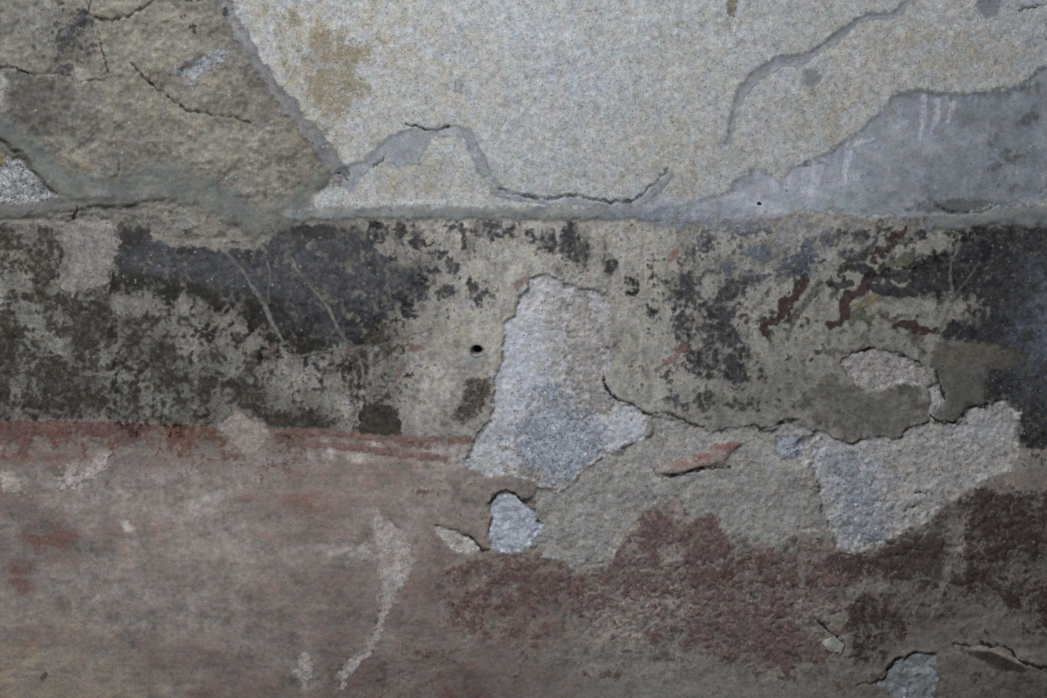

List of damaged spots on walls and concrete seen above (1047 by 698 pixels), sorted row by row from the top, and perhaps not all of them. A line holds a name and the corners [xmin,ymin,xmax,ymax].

crack [0,0,251,123]
spalling [0,153,60,204]
flaking render [431,219,1022,570]
spalling [866,651,939,698]
crack [952,641,1047,670]